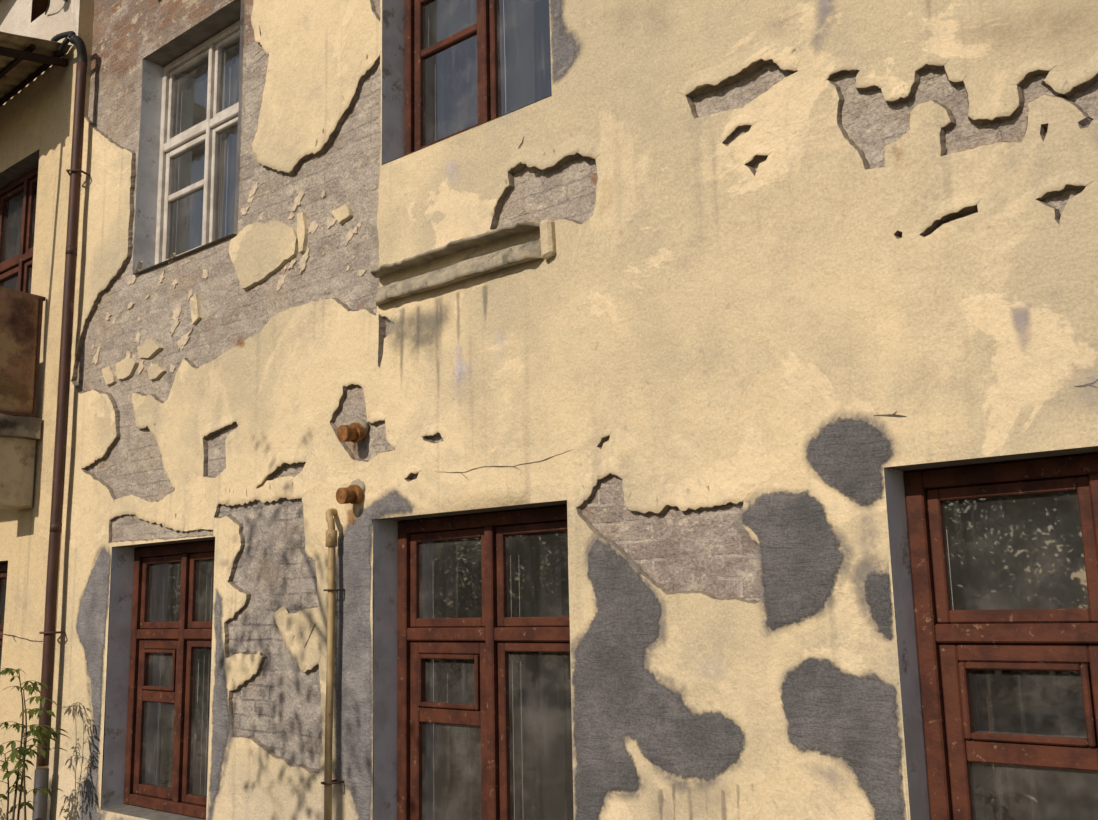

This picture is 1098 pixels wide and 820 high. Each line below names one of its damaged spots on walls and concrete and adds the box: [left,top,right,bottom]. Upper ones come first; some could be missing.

spalling [489,134,602,230]
spalling [678,39,800,146]
spalling [744,144,773,176]
spalling [823,52,1098,170]
spalling [1036,171,1094,225]
spalling [71,0,396,773]
crack [434,449,573,476]
spalling [575,429,763,604]